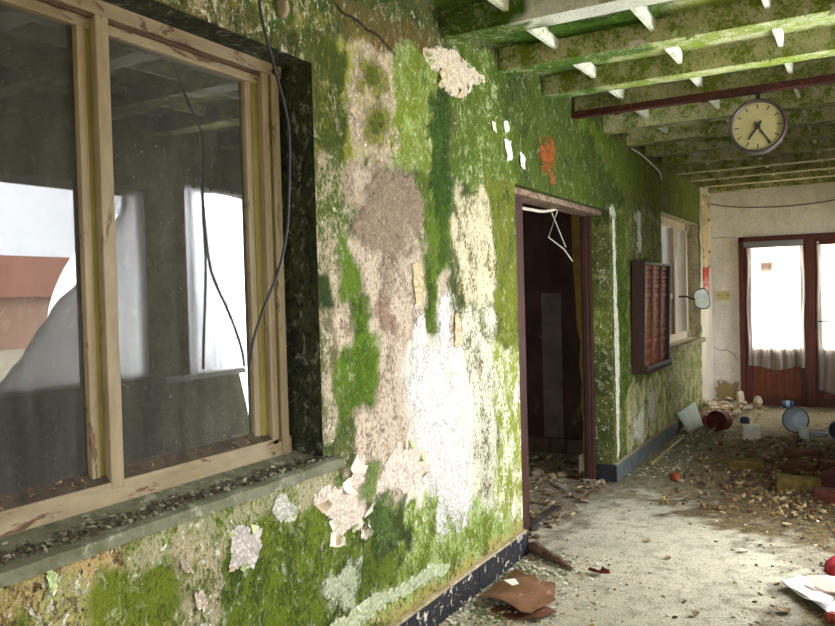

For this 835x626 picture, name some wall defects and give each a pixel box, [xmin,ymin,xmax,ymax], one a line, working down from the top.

peeling [423,46,485,98]
damp [348,44,425,336]
damp [427,87,455,264]
peeling [492,119,526,169]
rust [539,136,557,185]
damp [407,270,472,534]
peeling [272,492,301,523]
damp [359,459,385,506]
peeling [313,439,433,547]
peeling [229,524,263,572]
damp [322,556,363,610]